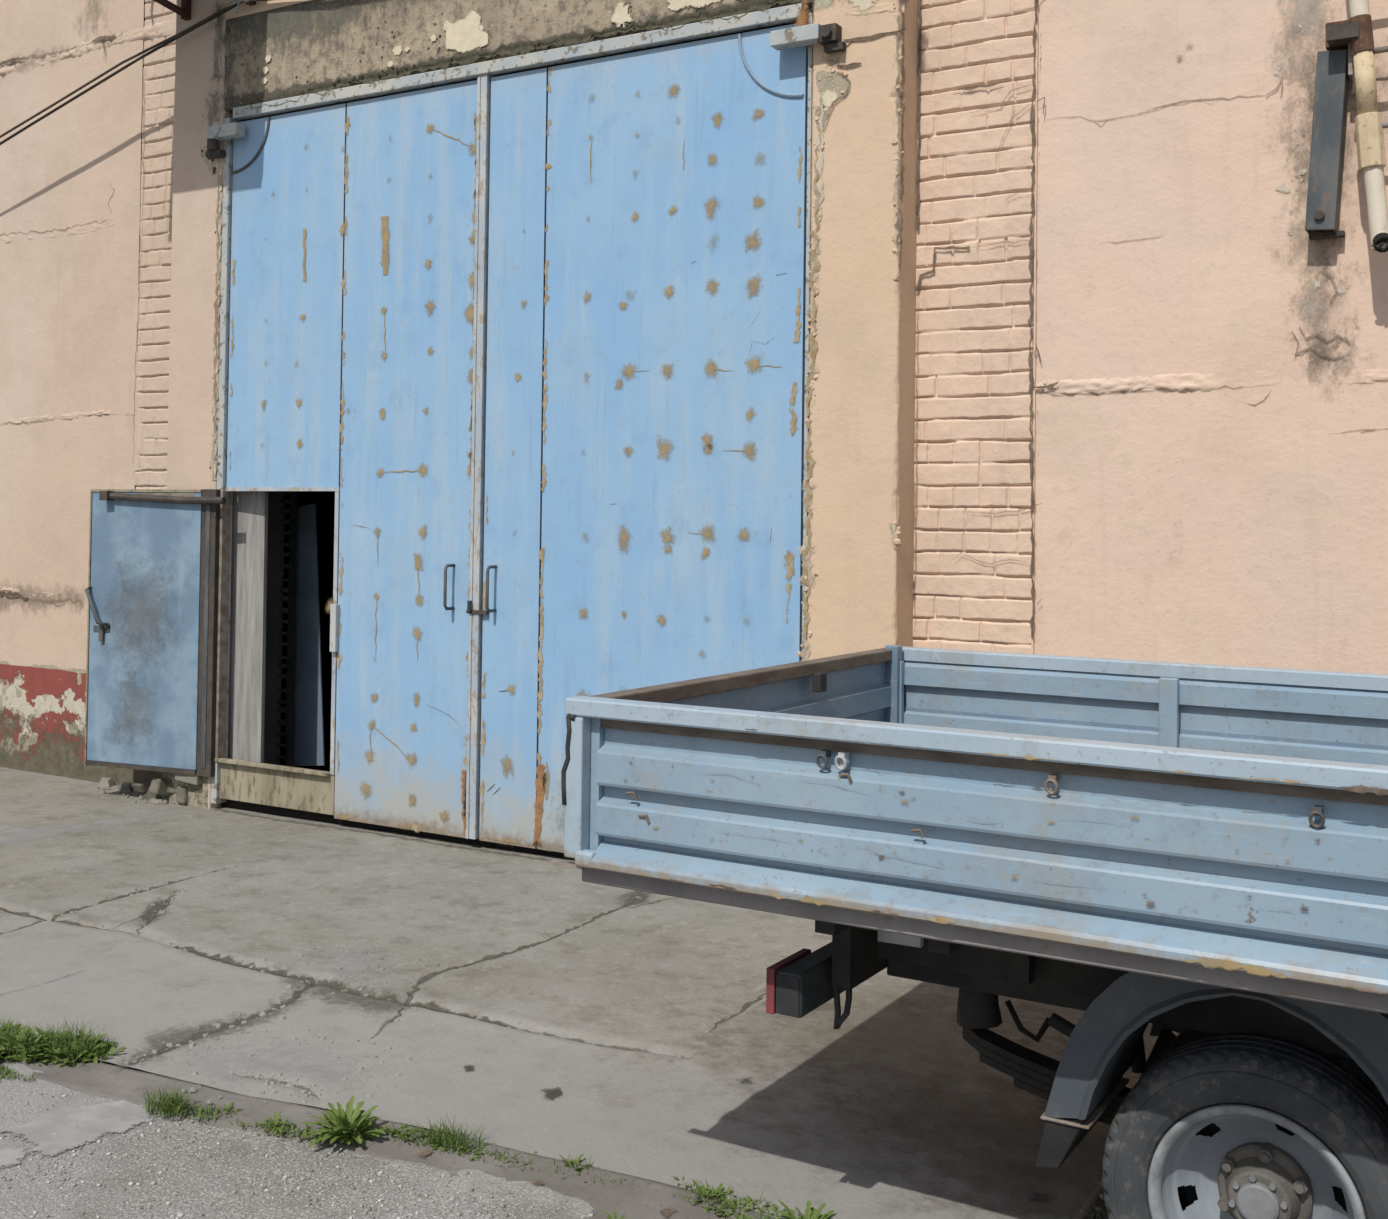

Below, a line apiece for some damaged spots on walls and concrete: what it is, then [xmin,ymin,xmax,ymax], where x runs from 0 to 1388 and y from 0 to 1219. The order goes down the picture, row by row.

peeling [430,9,491,53]
peeling [611,1,634,27]
peeling [666,0,738,11]
peeling [388,45,410,67]
crack [1146,95,1266,111]
spalling [812,0,908,292]
water stain [1266,0,1350,374]
crack [832,0,1045,638]
crack [0,586,83,609]
peeling [0,661,208,809]
crack [0,865,766,1068]
crack [220,1070,327,1103]